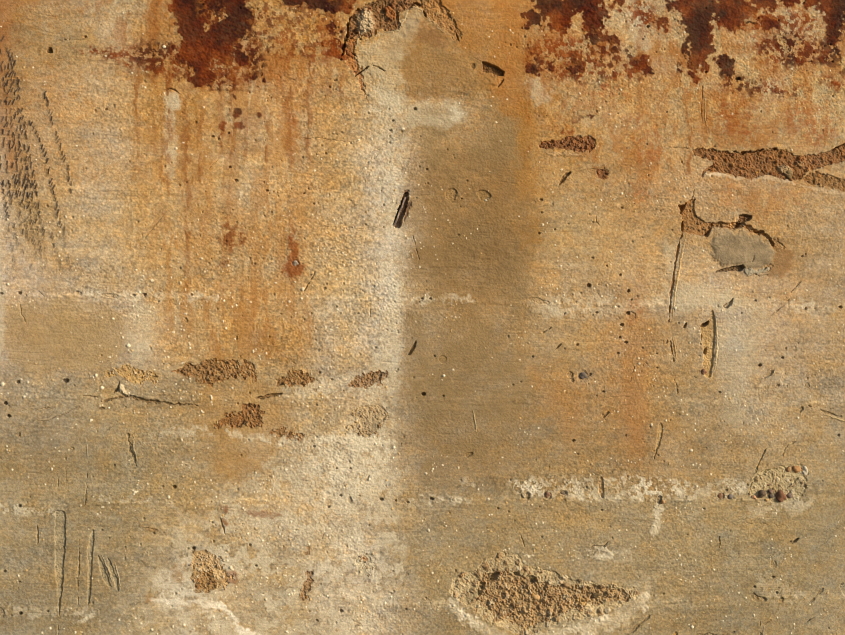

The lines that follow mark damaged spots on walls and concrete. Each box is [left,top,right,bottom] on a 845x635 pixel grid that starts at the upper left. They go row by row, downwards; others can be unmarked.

rust [0,0,61,177]
spalling [345,0,463,98]
spalling [539,135,597,158]
rust [441,0,845,268]
spalling [668,143,845,192]
rust [66,0,366,497]
spalling [678,199,786,249]
spalling [105,357,258,387]
rust [523,250,663,479]
spalling [214,403,306,443]
spalling [189,547,236,595]
spalling [449,551,641,635]